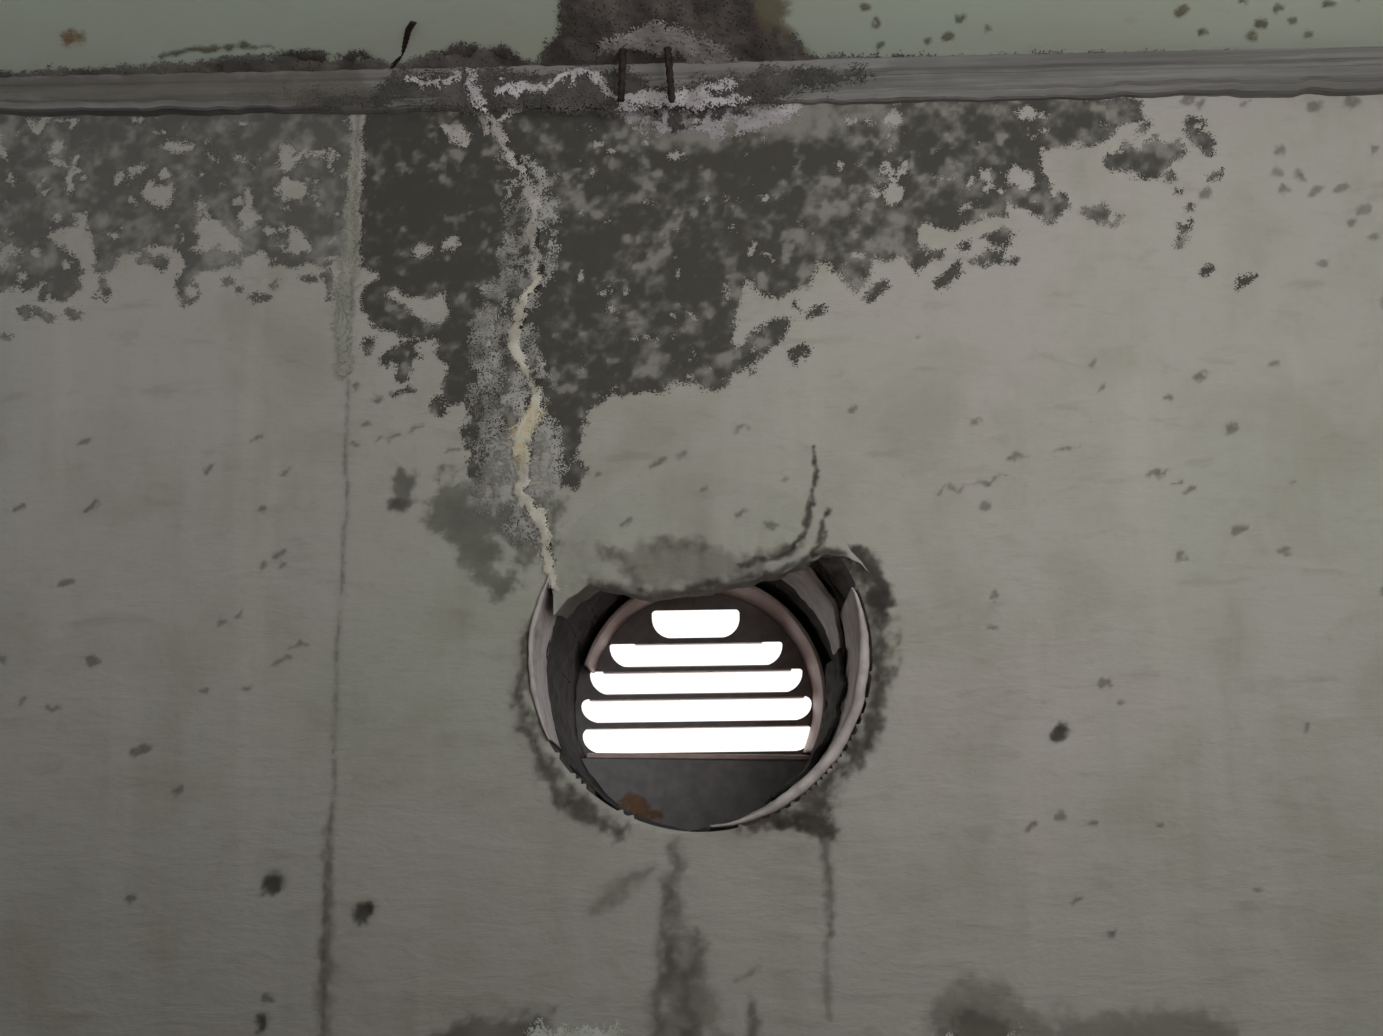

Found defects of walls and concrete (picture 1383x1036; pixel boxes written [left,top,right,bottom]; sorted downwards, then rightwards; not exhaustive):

water stain [281,0,878,122]
crack [404,66,590,593]
water stain [389,469,414,509]
water stain [430,486,537,596]
crack [740,445,830,567]
efflorescence [523,1018,623,1036]